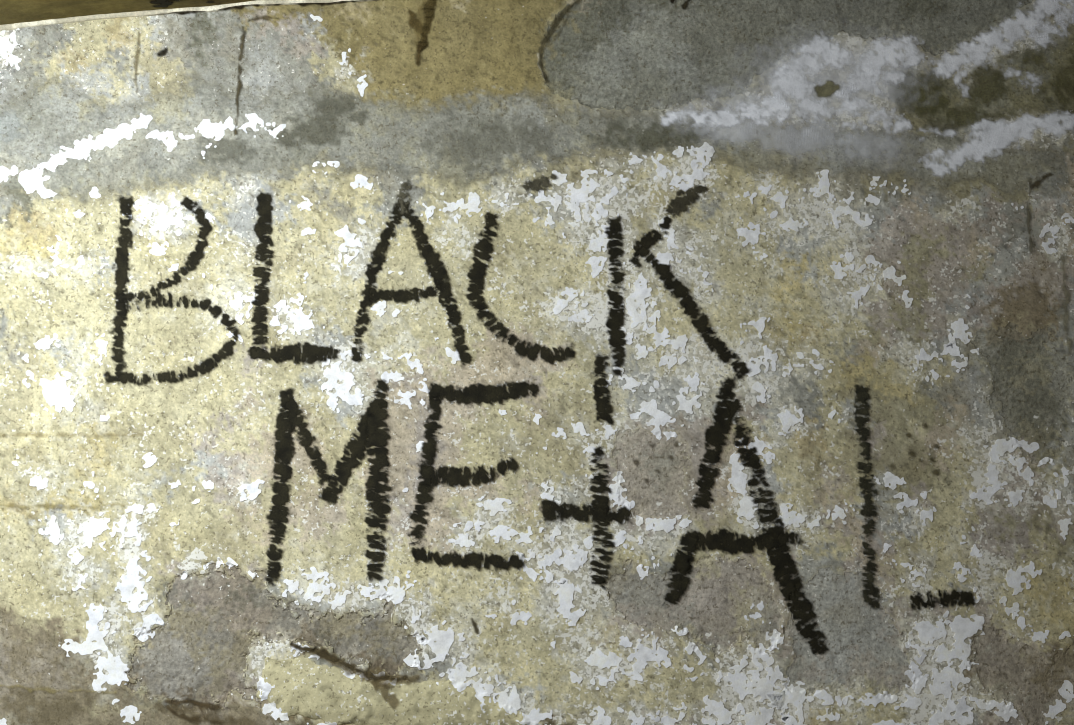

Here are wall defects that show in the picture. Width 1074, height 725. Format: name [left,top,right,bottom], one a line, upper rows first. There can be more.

crack [132,37,140,72]
crack [169,0,377,134]
leakage [0,0,1074,202]
crack [537,0,580,82]
crack [670,0,690,9]
peeling [416,142,715,278]
peeling [731,169,911,263]
peeling [318,349,430,413]
leakage [0,610,312,725]
flaking render [38,503,553,725]
crack [290,643,419,708]
peeling [448,496,596,626]